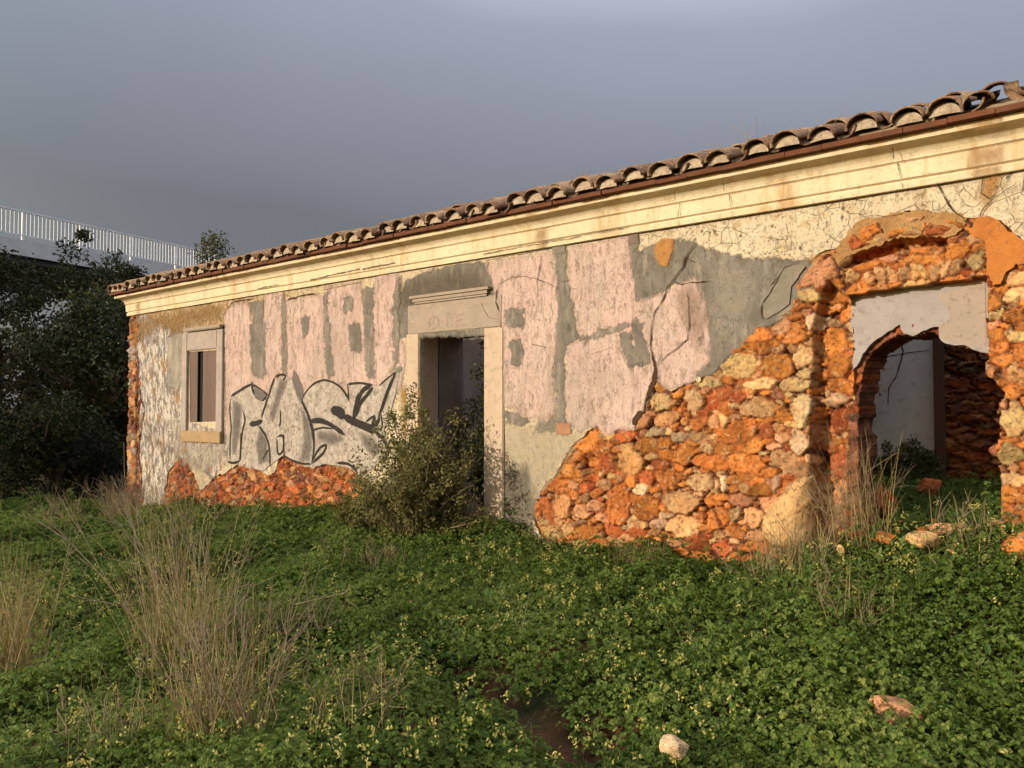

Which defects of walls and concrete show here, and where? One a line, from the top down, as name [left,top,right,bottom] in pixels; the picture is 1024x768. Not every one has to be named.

flaking render [654,238,674,267]
crack [632,192,708,425]
crack [723,184,811,318]
crack [858,147,1019,239]
peeling [126,314,363,514]